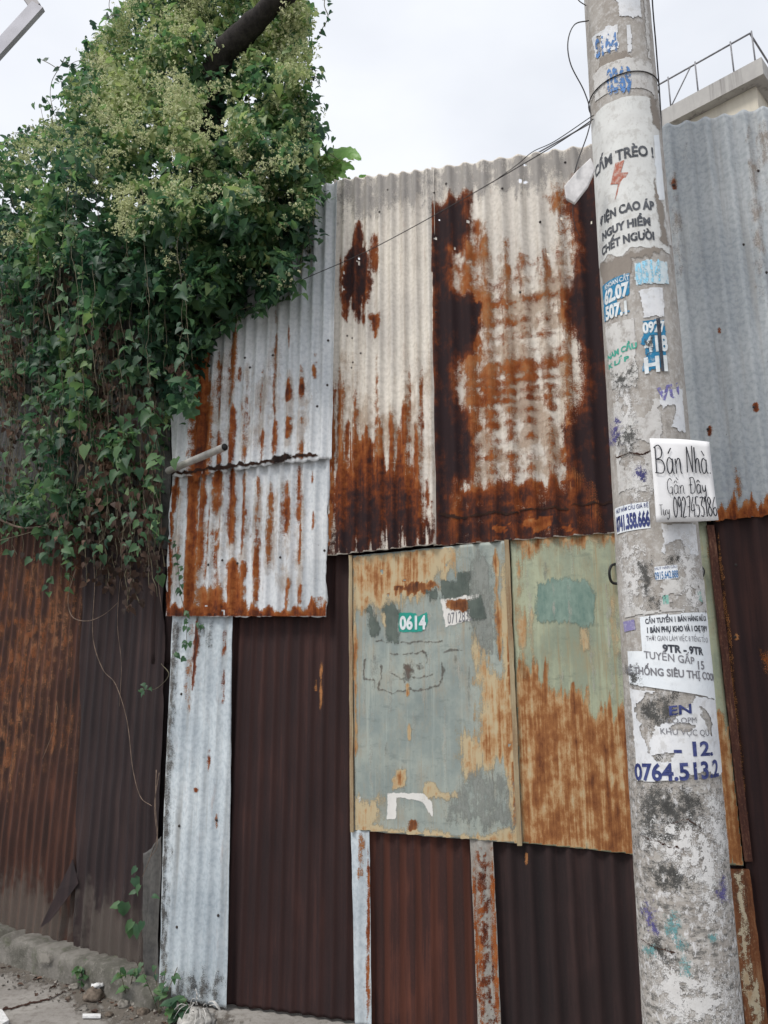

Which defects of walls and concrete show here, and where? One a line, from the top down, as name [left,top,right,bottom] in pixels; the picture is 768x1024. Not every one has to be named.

corrosion [0,541,82,807]
corrosion [166,311,327,711]
peeling [352,547,460,627]
corrosion [327,167,633,1024]
corrosion [708,536,748,865]
corrosion [716,468,768,521]